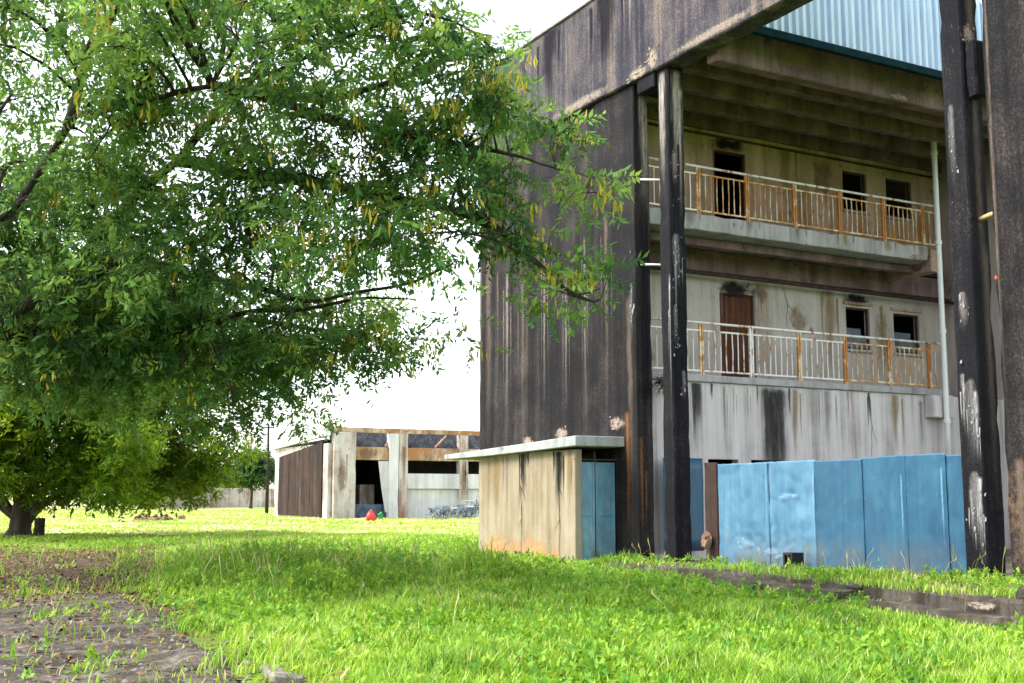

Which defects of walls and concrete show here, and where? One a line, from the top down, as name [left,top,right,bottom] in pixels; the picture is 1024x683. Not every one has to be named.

damp [589,0,624,50]
damp [537,29,559,76]
spalling [627,43,658,84]
spalling [609,416,624,430]
damp [692,383,801,462]
damp [892,396,903,428]
peeling [960,360,980,438]
damp [553,451,572,490]
peeling [966,473,987,546]